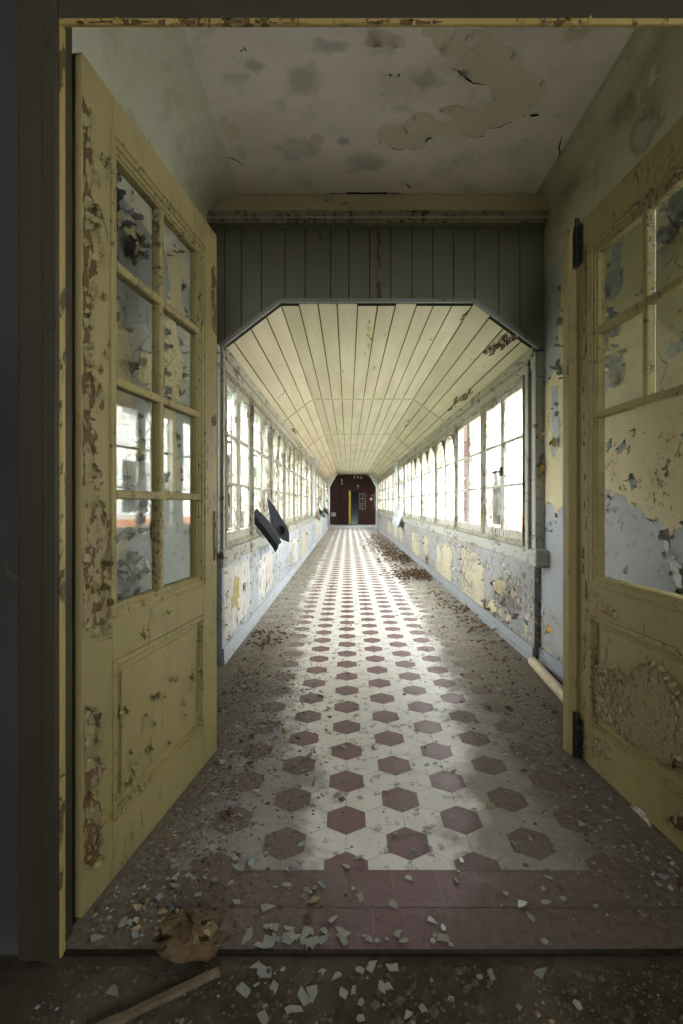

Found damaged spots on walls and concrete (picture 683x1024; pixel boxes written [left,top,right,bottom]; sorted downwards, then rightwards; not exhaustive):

peeling [81,94,189,642]
peeling [542,275,563,533]
peeling [605,186,683,540]
peeling [223,517,322,643]
peeling [388,521,552,643]
peeling [83,704,110,870]